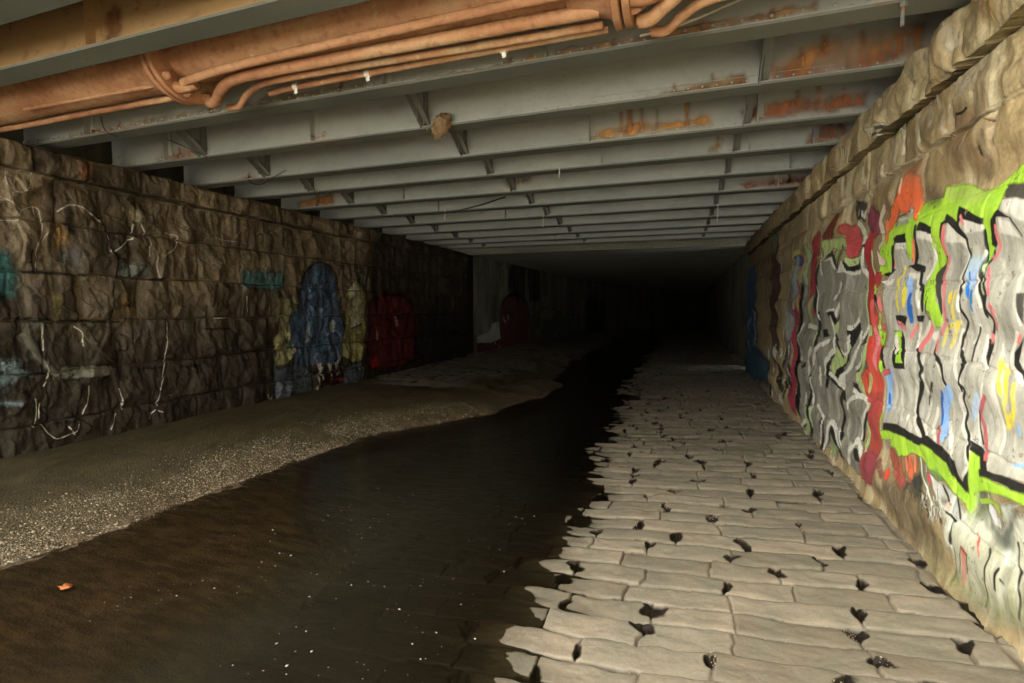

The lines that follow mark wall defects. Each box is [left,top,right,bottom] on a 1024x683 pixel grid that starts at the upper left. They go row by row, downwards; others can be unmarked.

rust [774,24,923,79]
rust [599,75,746,138]
rust [742,92,865,144]